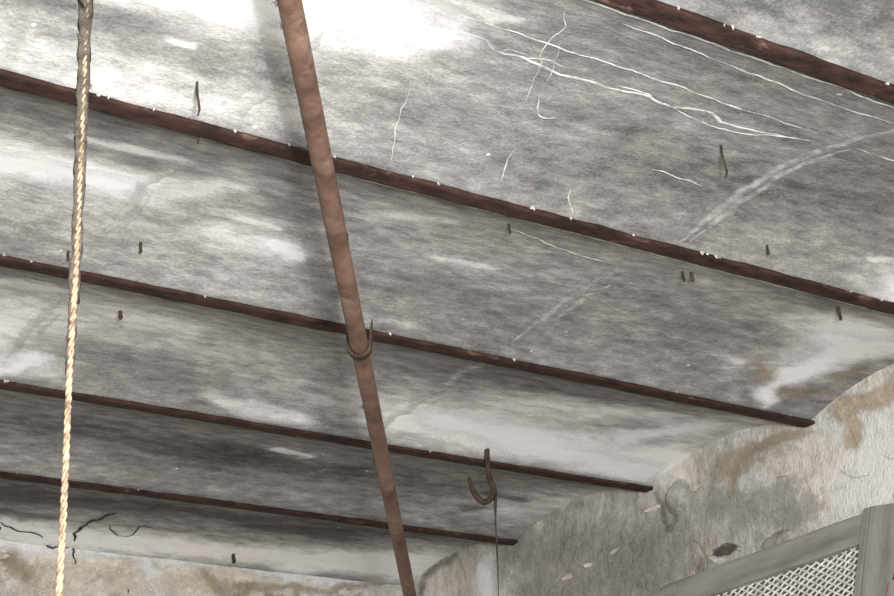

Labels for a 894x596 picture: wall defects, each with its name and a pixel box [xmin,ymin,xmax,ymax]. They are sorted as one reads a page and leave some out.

crack [418,16,816,141]
crack [625,24,892,124]
leakage [87,137,193,164]
leakage [123,178,249,208]
leakage [225,212,285,231]
leakage [426,254,498,270]
leakage [0,276,69,303]
leakage [270,447,316,458]
leakage [0,509,59,520]
crack [0,513,158,565]
peeling [0,552,256,596]